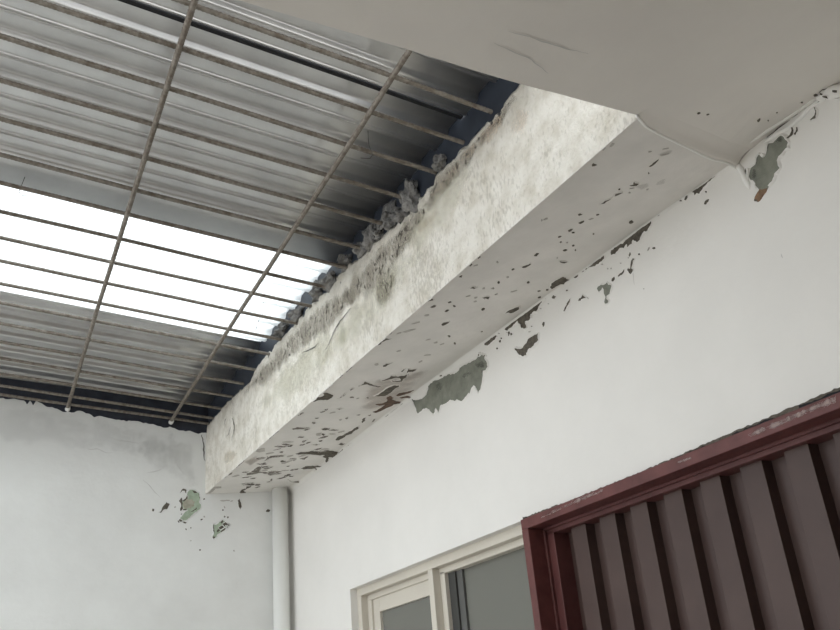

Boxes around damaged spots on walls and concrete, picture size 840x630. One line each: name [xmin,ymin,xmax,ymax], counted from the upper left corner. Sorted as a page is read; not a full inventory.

water stain [256,134,485,383]
peeling [557,181,648,264]
peeling [680,176,717,204]
peeling [745,127,798,202]
peeling [152,215,659,540]